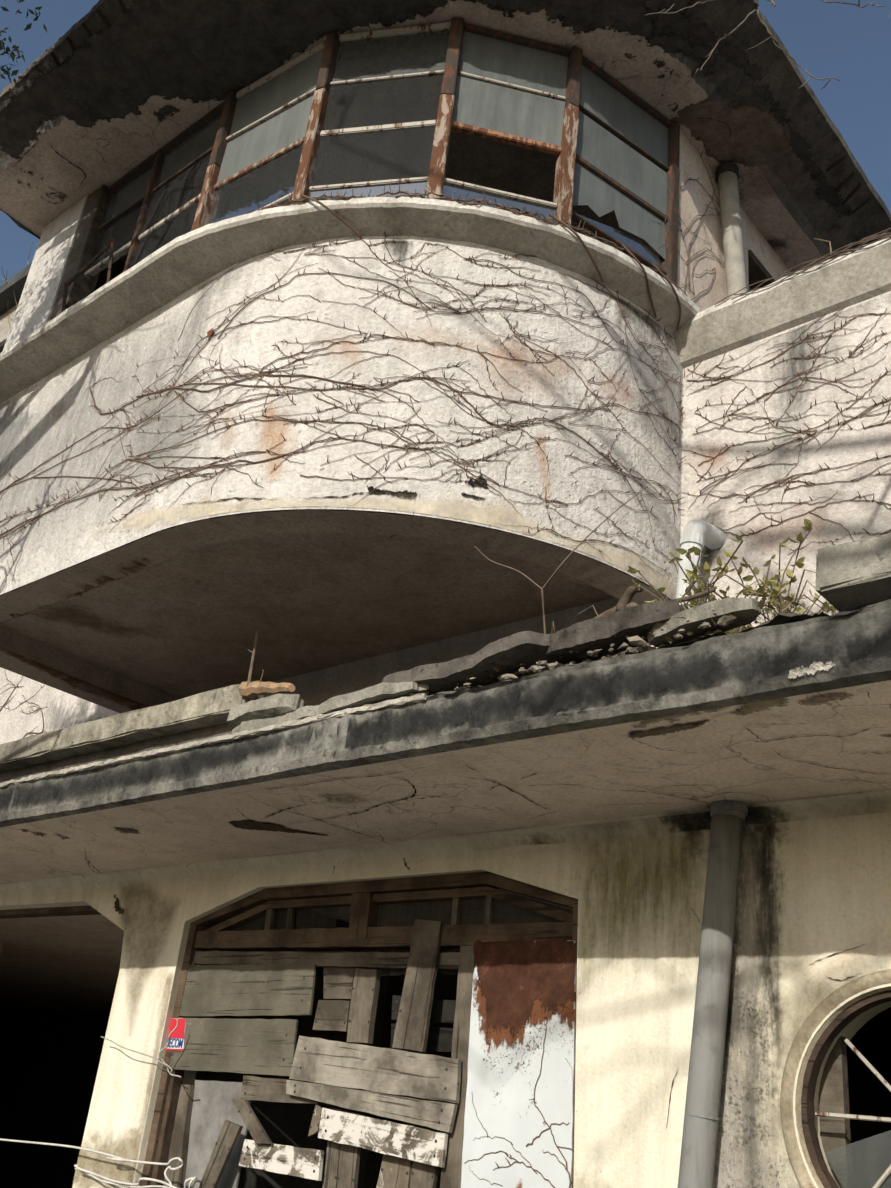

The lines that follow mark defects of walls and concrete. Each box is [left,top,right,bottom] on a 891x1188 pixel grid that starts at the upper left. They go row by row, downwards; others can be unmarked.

flaking render [0,0,870,222]
peeling [126,475,547,535]
peeling [559,540,675,599]
damp [0,732,310,808]
damp [333,634,891,758]
peeling [628,720,710,740]
crack [721,727,891,783]
peeling [788,661,835,678]
crack [237,764,769,870]
damp [672,811,712,840]
corrosion [473,939,576,1072]
damp [713,805,780,1188]